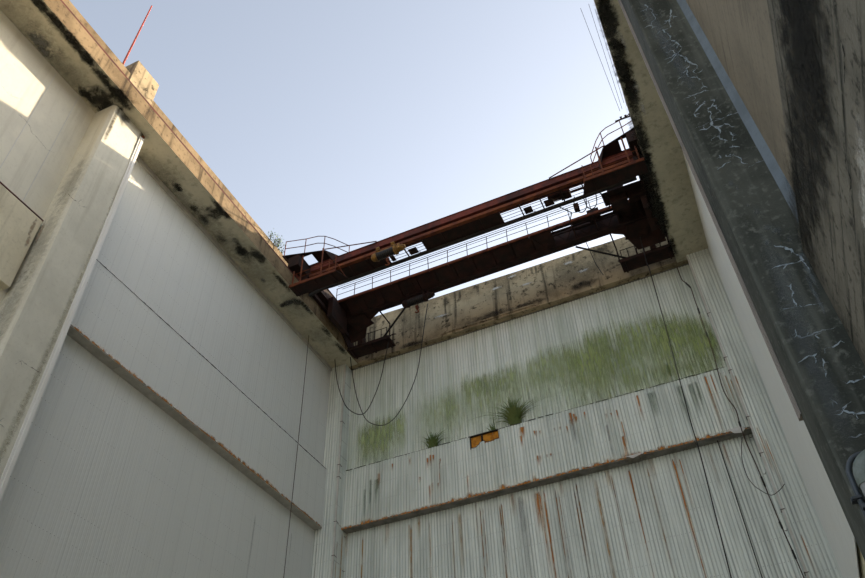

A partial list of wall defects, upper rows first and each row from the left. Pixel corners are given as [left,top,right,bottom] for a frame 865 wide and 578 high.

leakage [29,0,134,139]
crack [643,4,764,169]
rust [74,327,320,526]
leakage [190,201,231,224]
leakage [216,236,266,263]
leakage [273,273,313,314]
rust [335,410,732,578]
leakage [464,315,718,409]